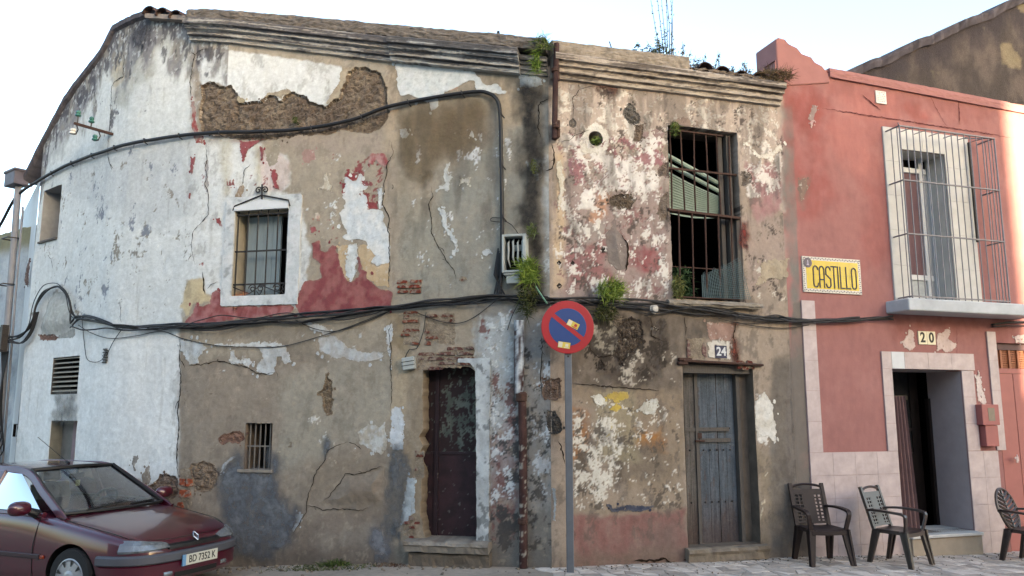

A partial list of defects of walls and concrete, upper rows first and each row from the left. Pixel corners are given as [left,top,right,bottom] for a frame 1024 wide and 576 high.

crack [188,150,216,292]
peeling [177,153,475,378]
flaking render [189,61,545,192]
crack [428,189,456,277]
water stain [518,84,549,305]
peeling [556,118,614,210]
flaking render [606,189,636,210]
flaking render [620,101,664,146]
peeling [754,392,779,444]
flaking render [129,430,248,508]
water stain [219,454,298,560]
crack [293,442,382,533]